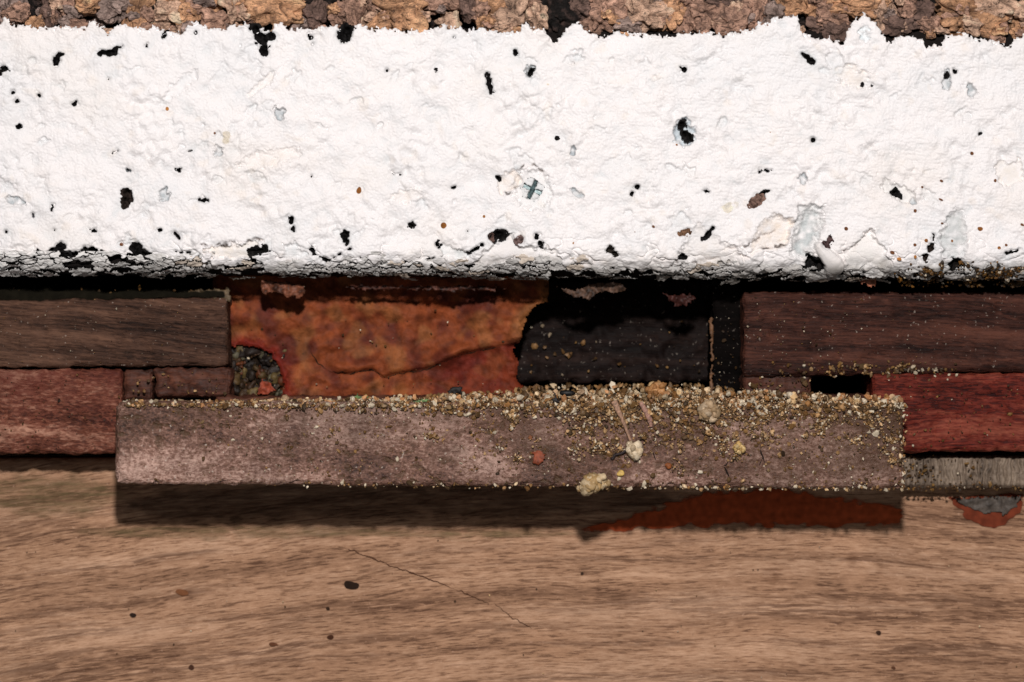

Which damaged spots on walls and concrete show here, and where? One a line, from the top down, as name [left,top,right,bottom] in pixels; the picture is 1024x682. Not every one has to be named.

crack [311,347,499,378]
peeling [257,379,276,394]
peeling [956,495,1021,516]
crack [341,547,530,627]